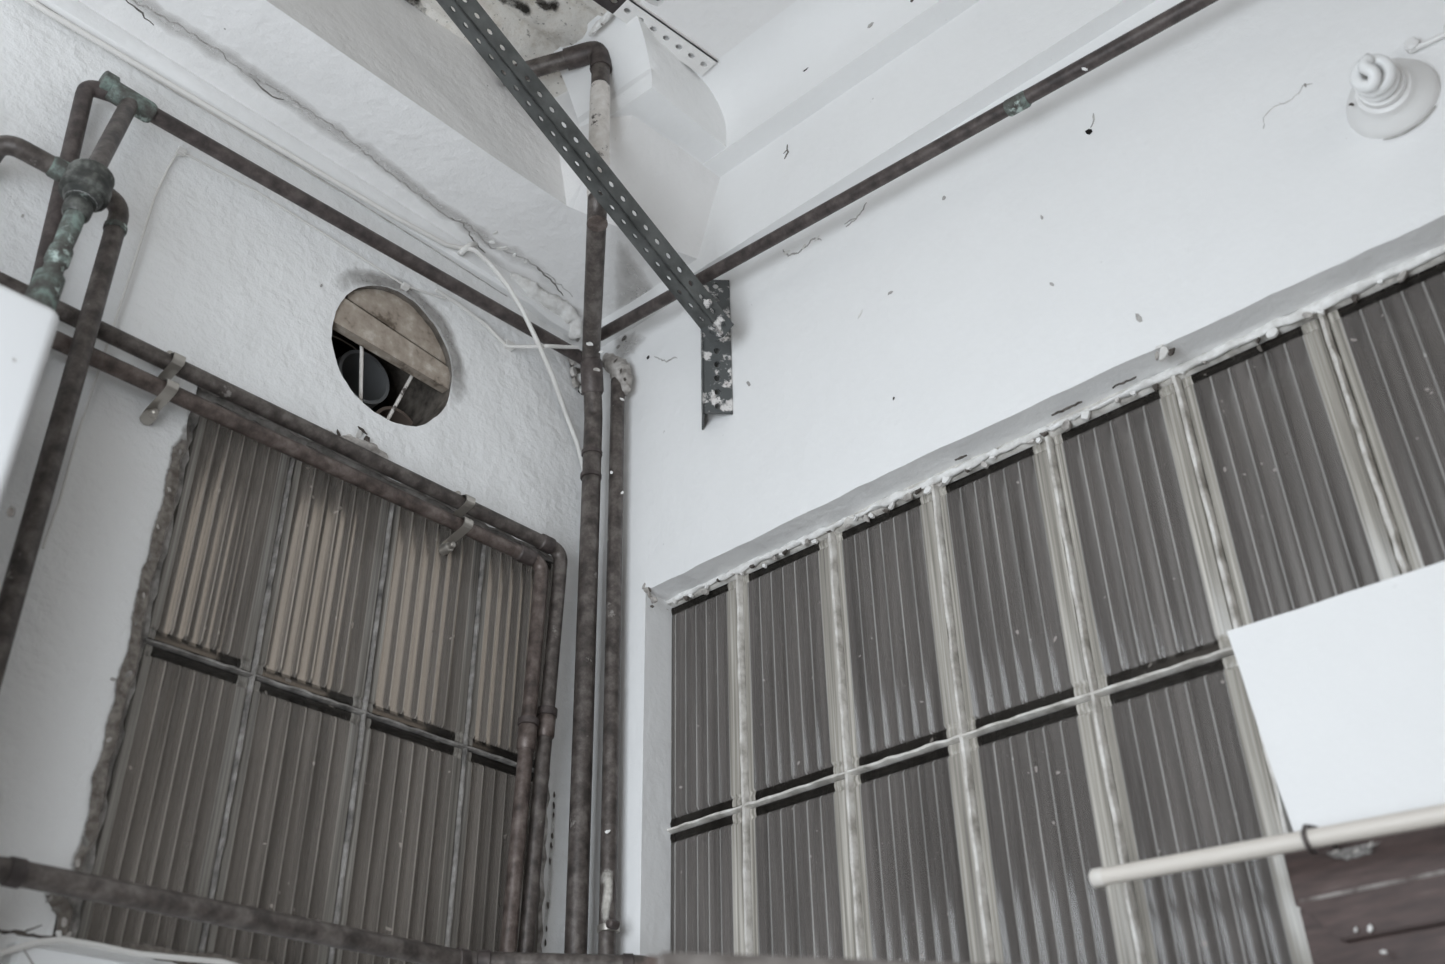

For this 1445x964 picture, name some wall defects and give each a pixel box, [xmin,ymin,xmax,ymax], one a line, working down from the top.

crack [125,0,573,297]
water stain [499,0,558,15]